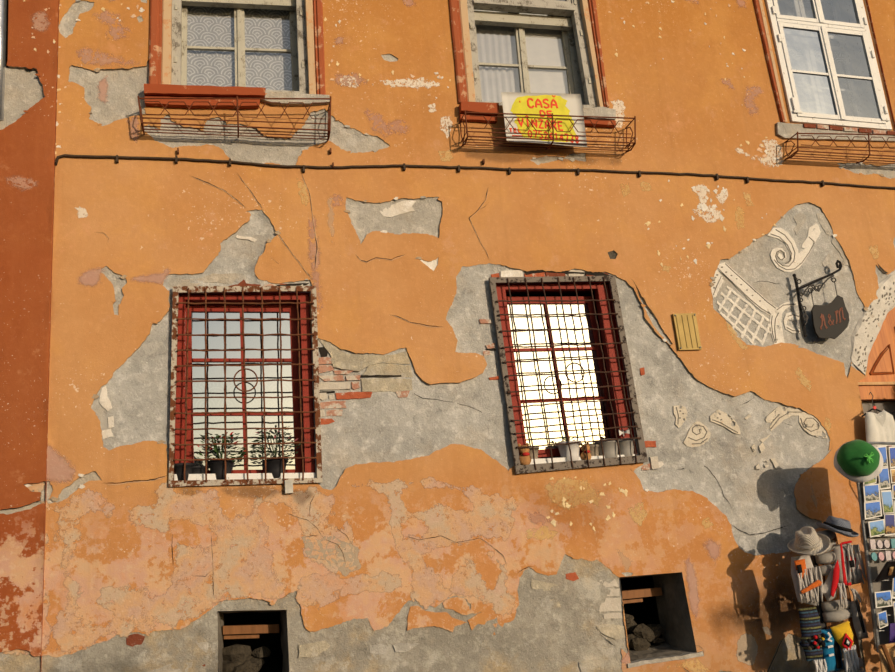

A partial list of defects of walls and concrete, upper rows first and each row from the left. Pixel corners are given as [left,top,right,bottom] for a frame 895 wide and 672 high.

spalling [0,65,45,130]
spalling [57,48,407,165]
peeling [328,54,453,162]
peeling [611,100,626,129]
spalling [530,153,586,165]
peeling [735,137,783,167]
crack [192,176,264,210]
crack [270,175,318,278]
spalling [331,196,443,244]
peeling [680,184,754,231]
spalling [709,202,874,377]
spalling [0,209,831,672]